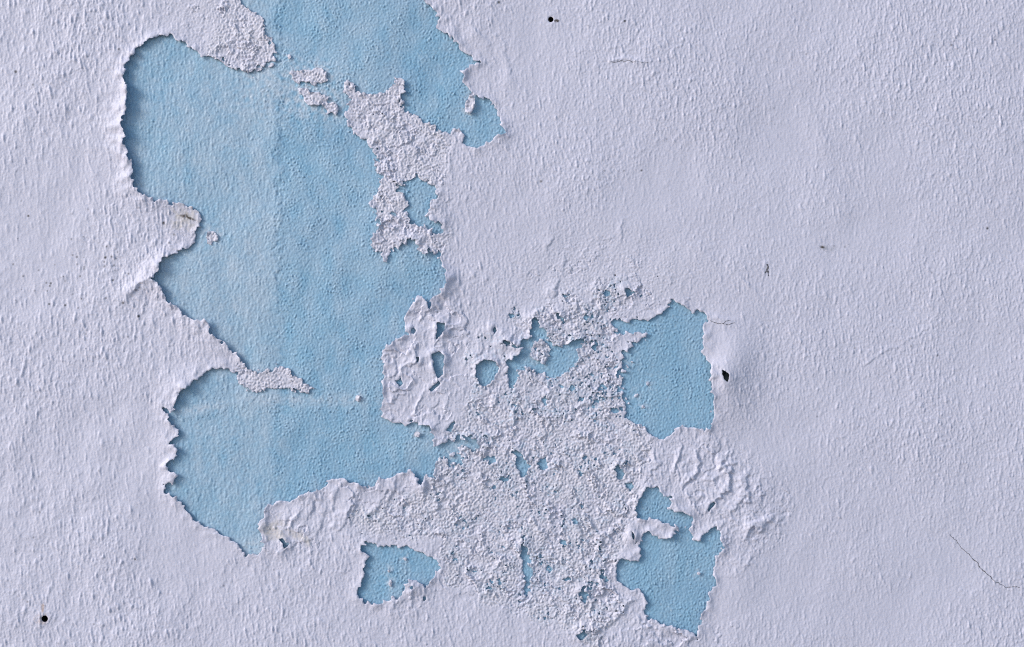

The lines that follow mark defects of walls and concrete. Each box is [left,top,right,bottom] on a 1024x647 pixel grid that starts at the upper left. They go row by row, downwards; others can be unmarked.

peeling [109,0,734,647]
crack [950,535,1020,588]